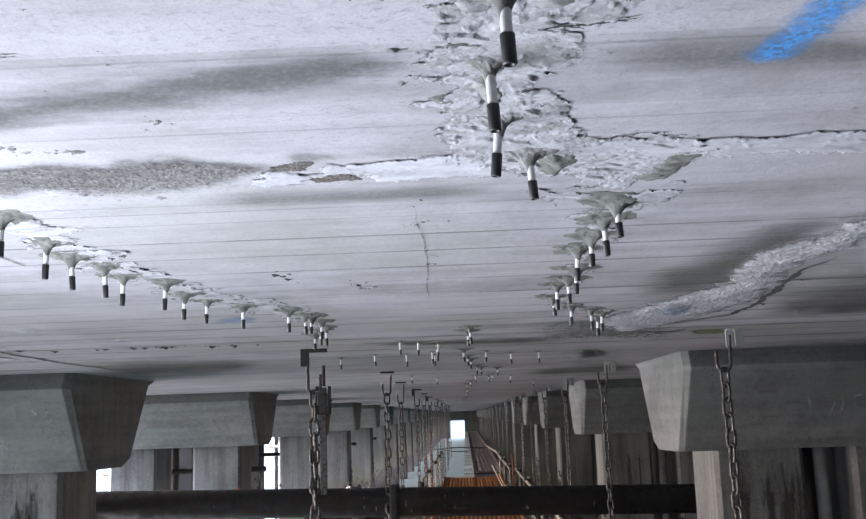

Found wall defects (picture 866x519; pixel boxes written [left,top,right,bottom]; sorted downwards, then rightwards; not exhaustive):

peeling [449,0,490,20]
peeling [513,0,575,12]
peeling [385,42,468,60]
damp [0,62,385,124]
peeling [428,93,462,114]
peeling [0,146,85,156]
peeling [538,154,578,176]
peeling [632,152,702,181]
spalling [0,155,491,202]